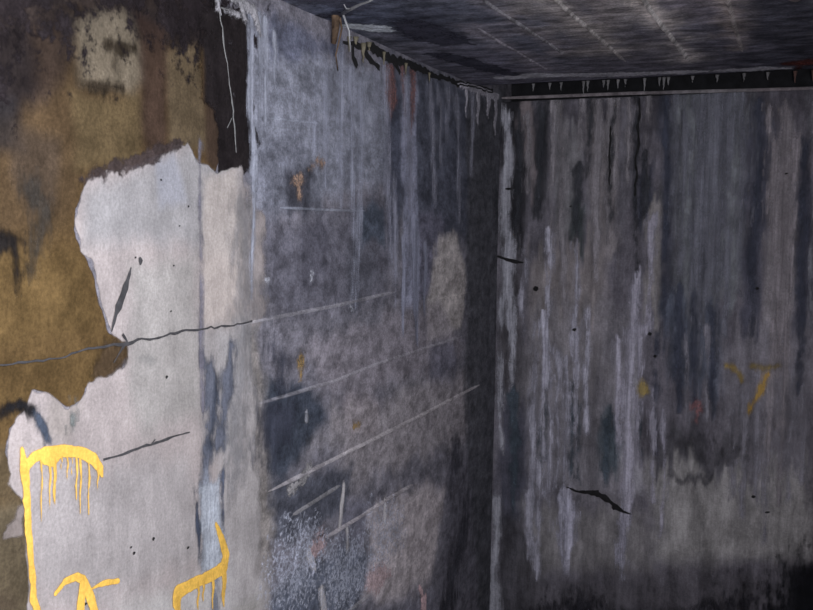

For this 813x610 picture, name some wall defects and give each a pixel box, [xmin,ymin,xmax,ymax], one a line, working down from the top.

crack [0,257,253,366]
peeling [3,143,270,610]
water stain [0,0,277,610]
water stain [401,212,427,344]
water stain [458,82,813,580]
crack [103,432,190,461]
water stain [306,547,316,571]
water stain [318,586,327,610]
water stain [339,483,349,552]
water stain [489,496,502,610]
crack [566,487,631,515]